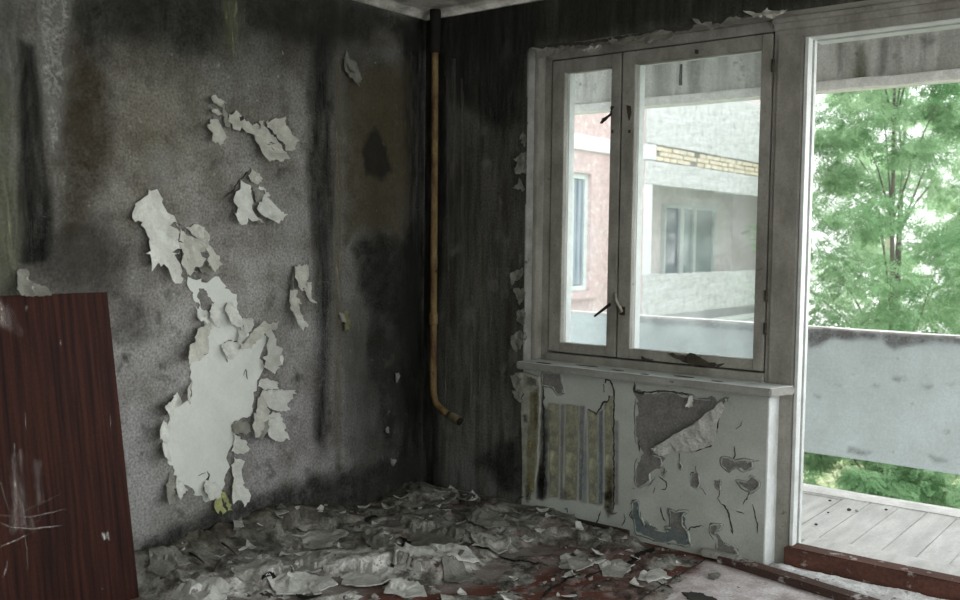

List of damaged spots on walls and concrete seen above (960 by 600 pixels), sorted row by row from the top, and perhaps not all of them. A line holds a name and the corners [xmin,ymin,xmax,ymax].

peeling [344,51,362,85]
water stain [0,0,227,289]
peeling [207,95,299,162]
peeling [223,169,287,225]
peeling [16,269,52,297]
peeling [289,264,317,331]
water stain [142,0,539,550]
peeling [132,189,297,515]
spalling [510,362,566,501]
spalling [631,382,761,548]
spalling [709,523,740,555]